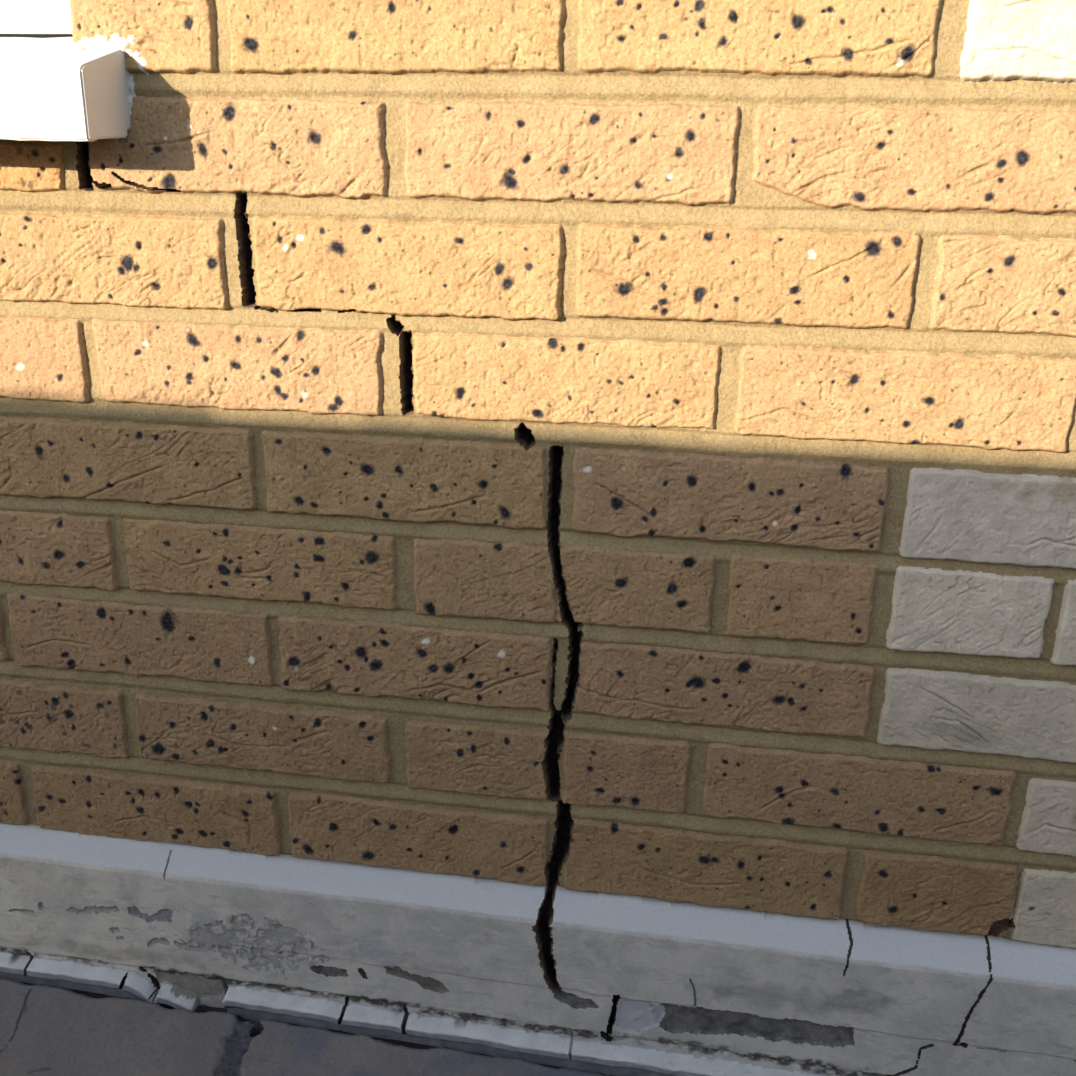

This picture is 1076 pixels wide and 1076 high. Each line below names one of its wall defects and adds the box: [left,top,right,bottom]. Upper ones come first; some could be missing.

crack [75,141,181,192]
crack [233,191,356,313]
crack [386,314,415,416]
crack [514,422,584,993]
crack [163,850,172,880]
spalling [66,905,173,923]
peeling [147,912,368,979]
crack [843,919,853,976]
crack [0,952,613,1076]
spalling [614,999,855,1048]
crack [886,934,1007,1076]